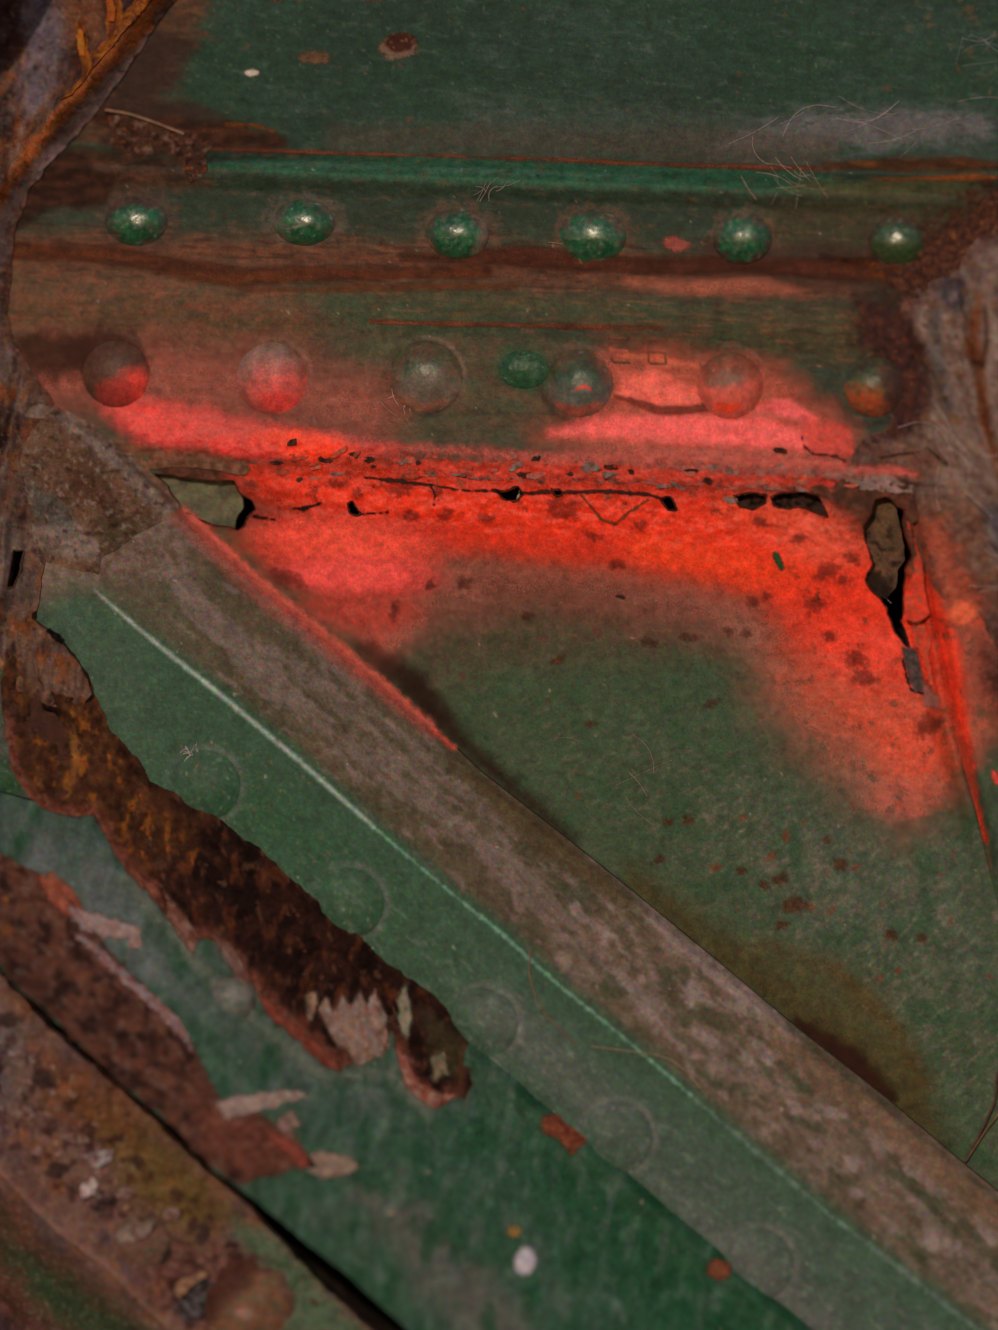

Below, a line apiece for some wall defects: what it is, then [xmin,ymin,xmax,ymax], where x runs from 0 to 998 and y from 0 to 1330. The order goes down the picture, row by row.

corrosion [60,0,151,100]
crack [252,502,321,520]
corrosion [269,438,439,492]
corrosion [451,450,547,489]
crack [362,477,661,525]
corrosion [566,462,634,500]
corrosion [656,462,739,503]
corrosion [755,447,810,489]
crack [902,659,924,695]